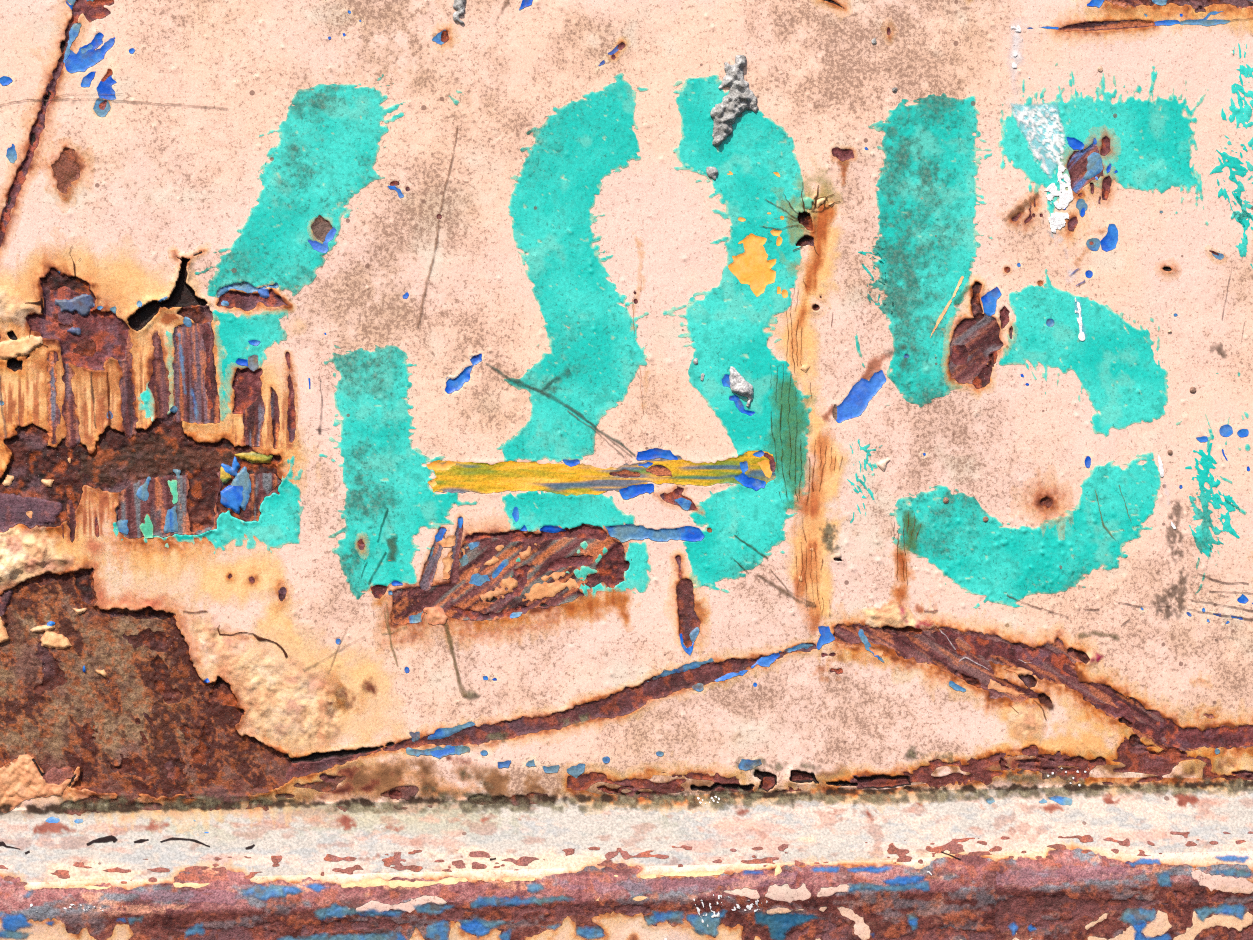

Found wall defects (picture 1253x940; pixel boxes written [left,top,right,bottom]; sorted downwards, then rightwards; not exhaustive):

rust [1054,0,1253,36]
rust [1065,133,1113,237]
spalling [128,249,293,331]
peeling [0,335,43,376]
peeling [230,340,265,447]
rust [0,188,1253,834]
spalling [281,554,1253,788]
rust [0,831,1253,940]